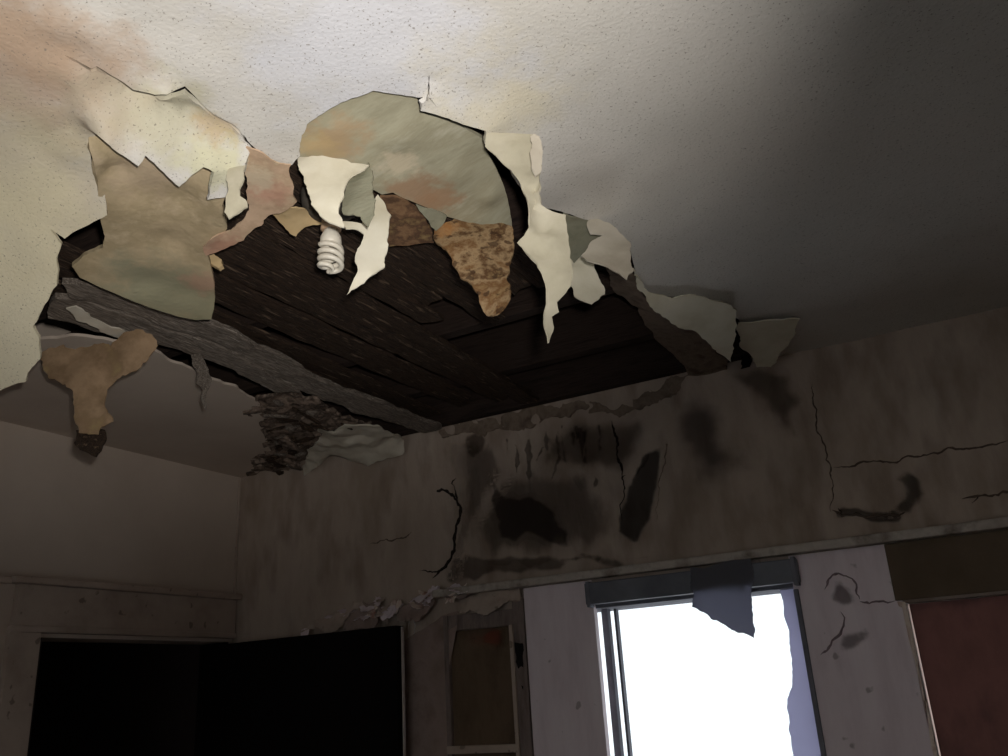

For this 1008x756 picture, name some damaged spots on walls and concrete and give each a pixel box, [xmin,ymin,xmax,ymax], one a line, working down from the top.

peeling [224,160,249,219]
peeling [298,156,391,294]
corrosion [433,219,514,317]
peeling [439,132,800,438]
flaking render [302,424,404,476]
crack [422,478,462,578]
water stain [493,492,566,543]
water stain [839,476,920,521]
crack [811,387,1008,519]
peeling [301,583,521,636]